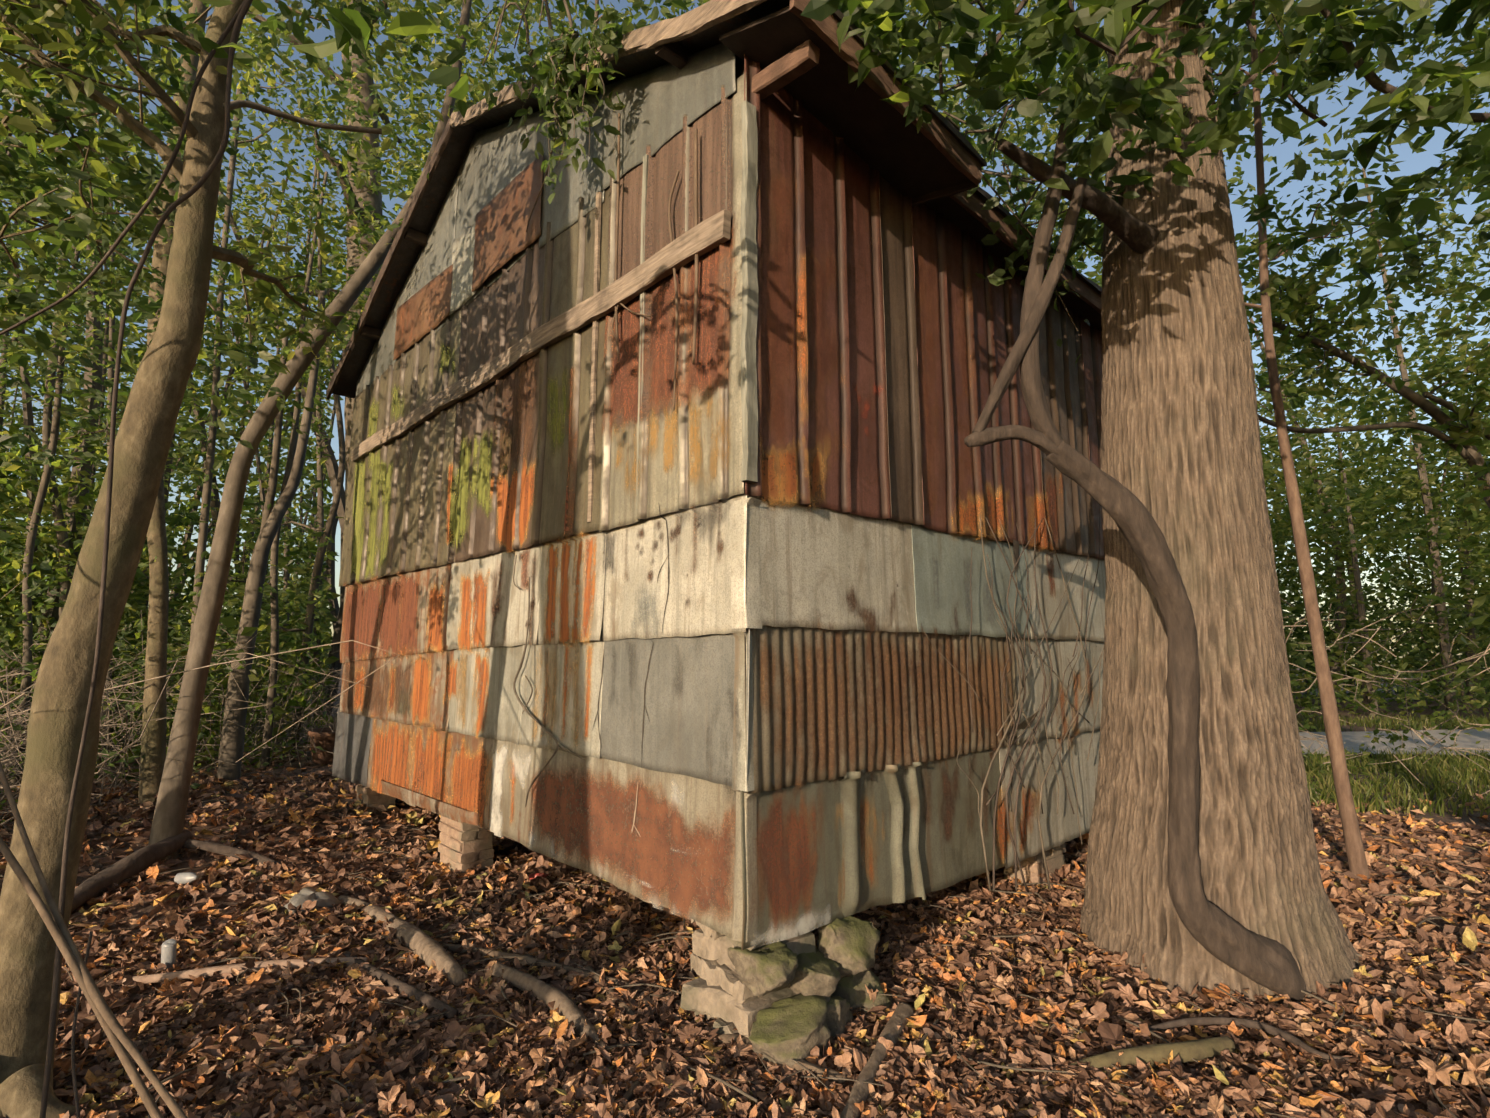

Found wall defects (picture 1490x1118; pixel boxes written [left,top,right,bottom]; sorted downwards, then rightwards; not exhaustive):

corrosion [342,355,596,832]
corrosion [760,590,1013,840]
corrosion [959,485,1005,534]
corrosion [511,765,736,919]